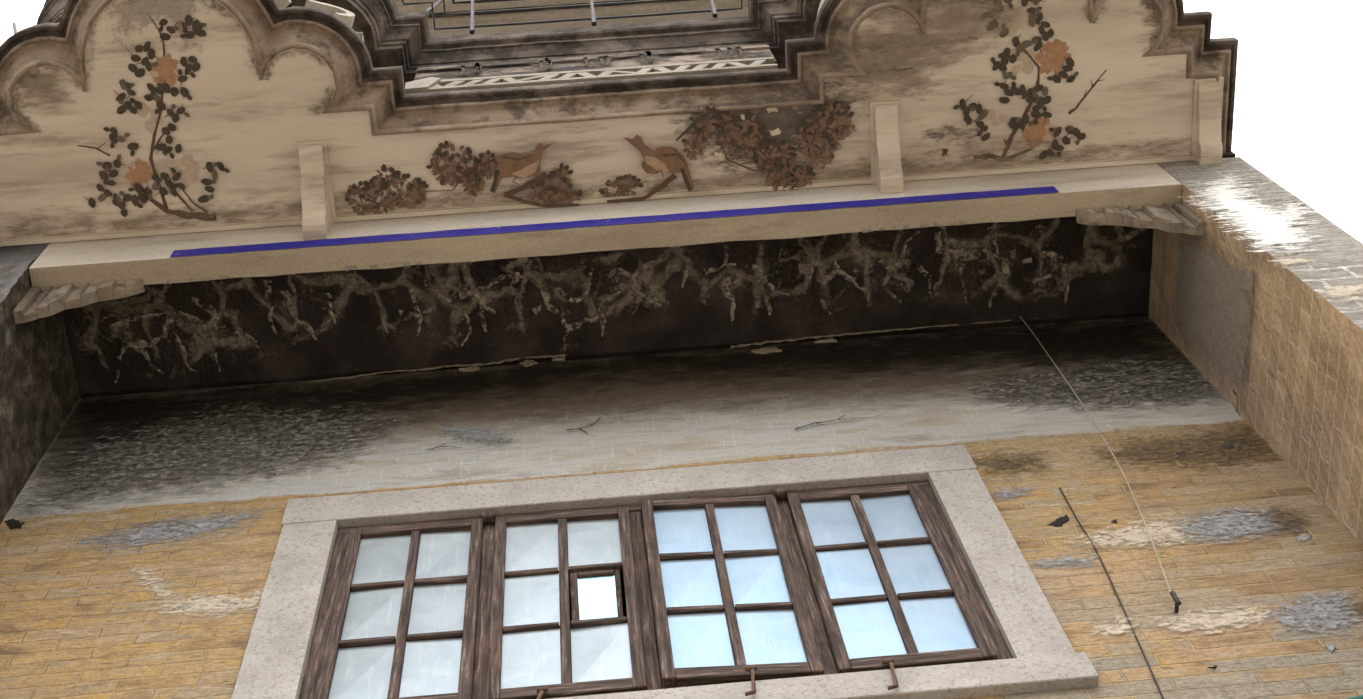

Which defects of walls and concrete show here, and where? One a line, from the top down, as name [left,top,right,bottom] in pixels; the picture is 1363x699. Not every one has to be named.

mould [956,354,1223,411]
leakage [16,394,417,522]
leakage [972,450,1055,500]
leakage [1081,424,1279,473]
leakage [70,508,269,553]
leakage [1170,503,1311,544]
leakage [1262,591,1363,653]